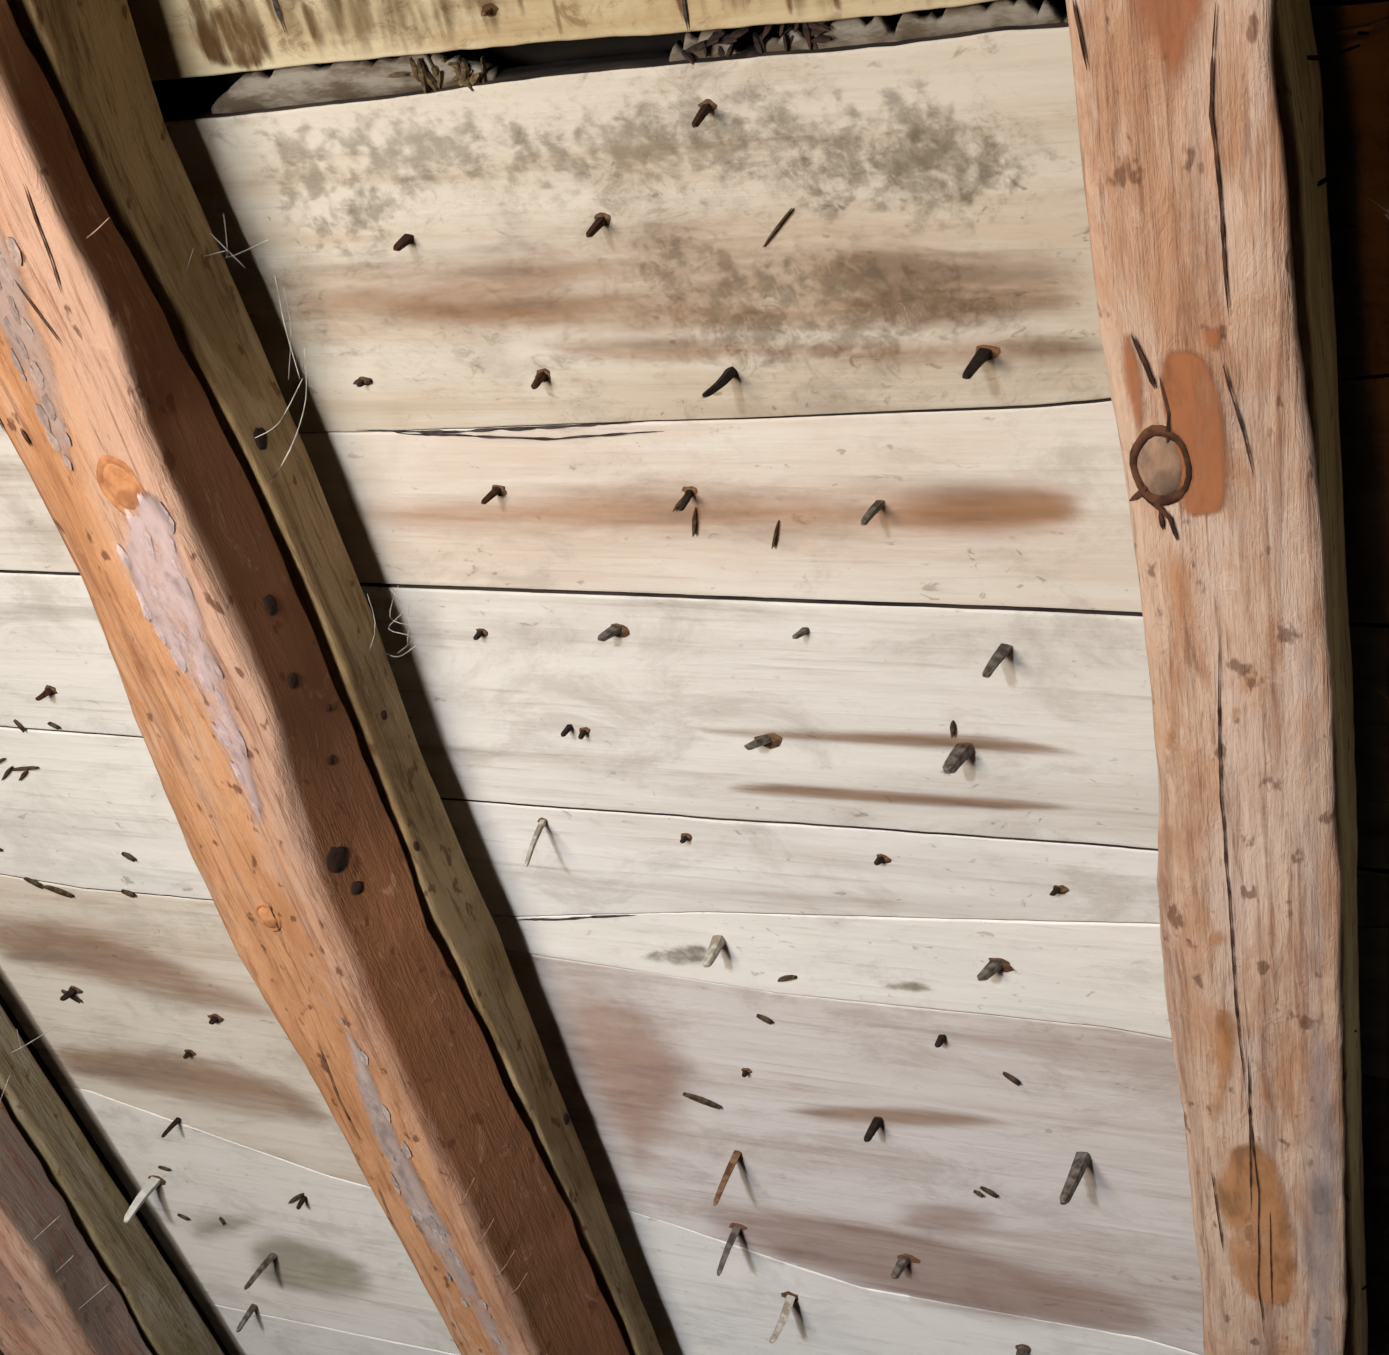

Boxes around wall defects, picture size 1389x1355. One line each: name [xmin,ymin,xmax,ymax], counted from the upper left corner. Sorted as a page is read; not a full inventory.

leakage [188,0,266,68]
leakage [303,5,315,38]
crack [1209,2,1230,325]
crack [1131,335,1171,443]
crack [1223,365,1253,473]
crack [1129,486,1178,541]
crack [1217,650,1273,1338]